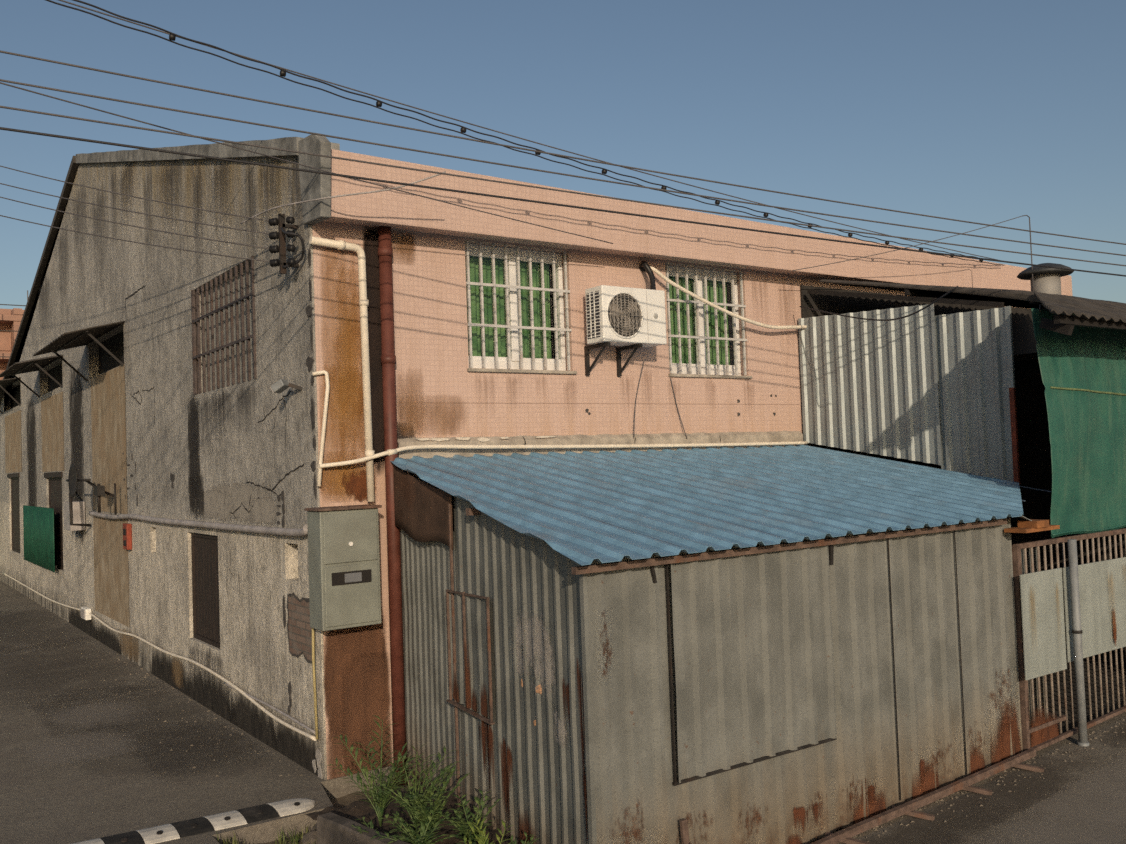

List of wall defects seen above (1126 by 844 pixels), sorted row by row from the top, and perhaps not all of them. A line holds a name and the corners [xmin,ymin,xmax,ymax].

damp [188,393,225,515]
crack [217,391,304,520]
damp [69,610,138,657]
flaking render [283,592,315,663]
damp [150,649,318,776]
corrosion [453,653,512,813]
corrosion [518,819,534,844]
corrosion [788,803,820,844]
corrosion [847,779,886,824]